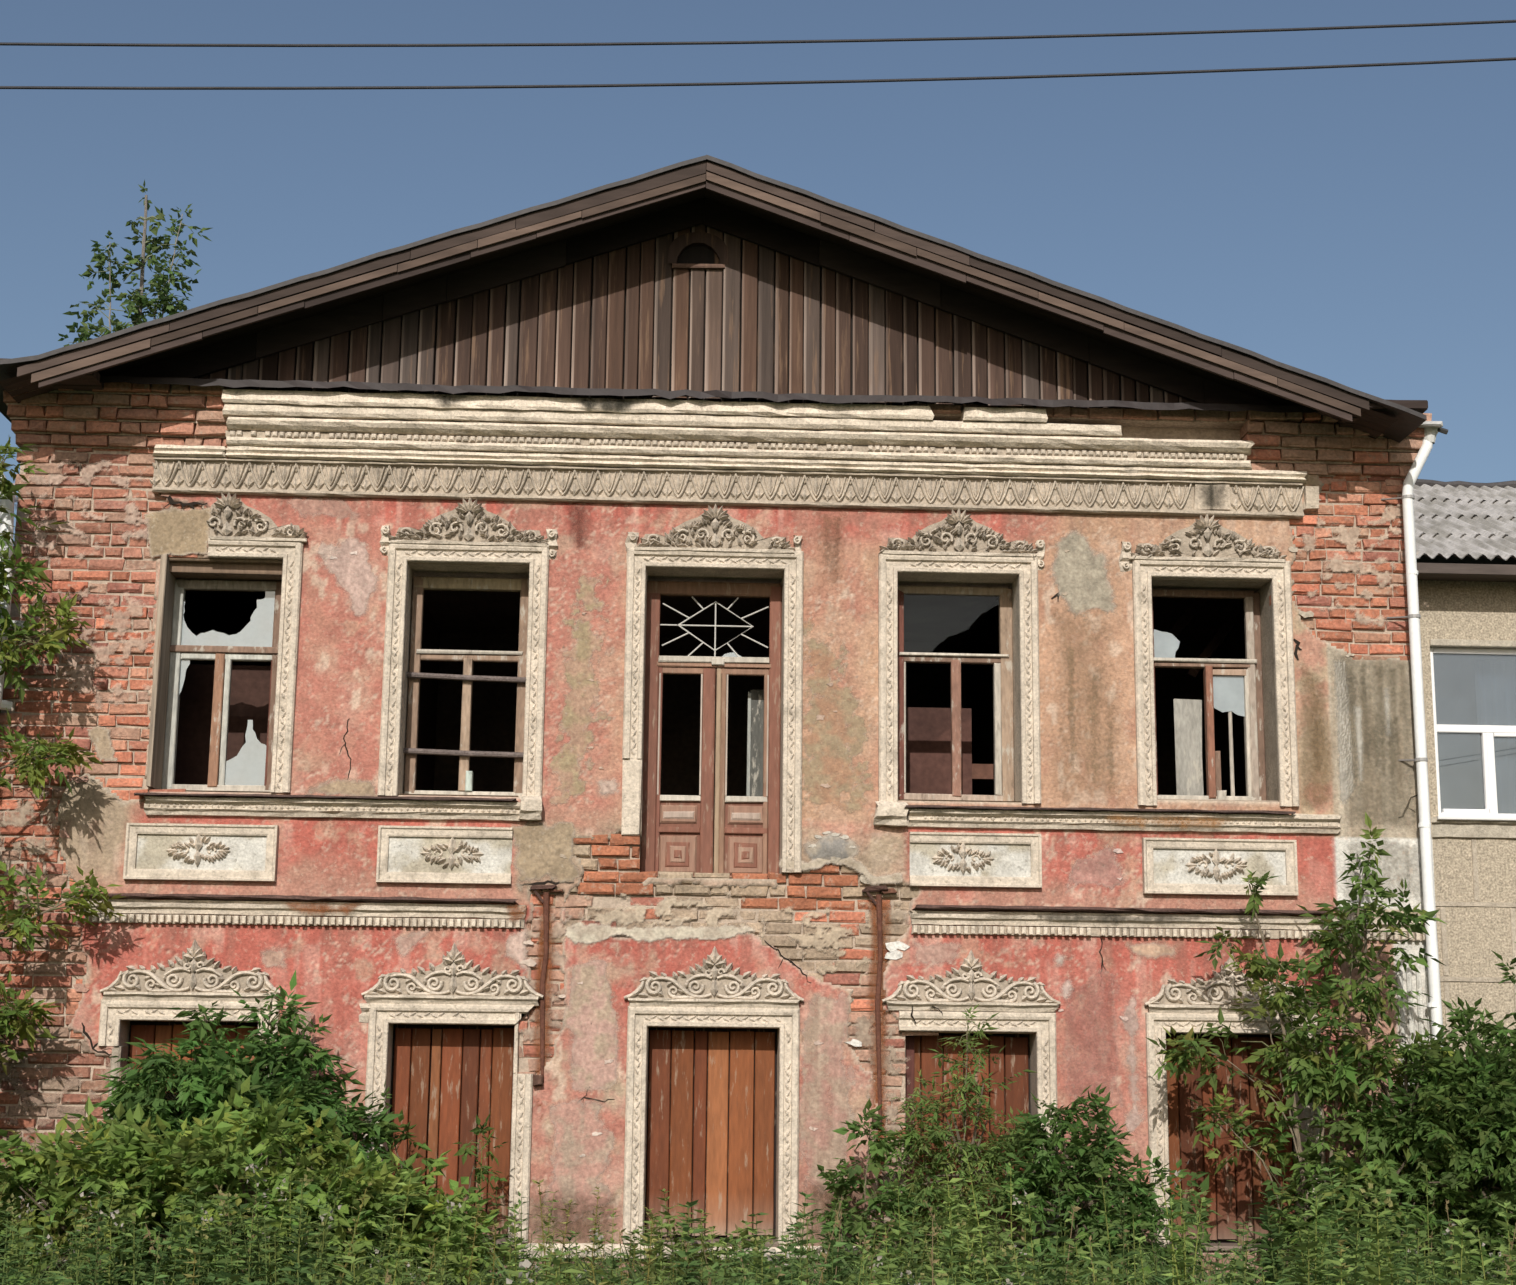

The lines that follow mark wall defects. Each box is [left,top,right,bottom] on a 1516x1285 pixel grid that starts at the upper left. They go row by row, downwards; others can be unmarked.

peeling [1052,532,1116,615]
spalling [1288,475,1410,660]
spalling [0,447,211,1167]
crack [339,719,351,780]
peeling [550,574,618,804]
peeling [802,619,873,813]
damp [1305,659,1408,823]
spalling [506,822,958,1246]
rust [870,903,888,1012]